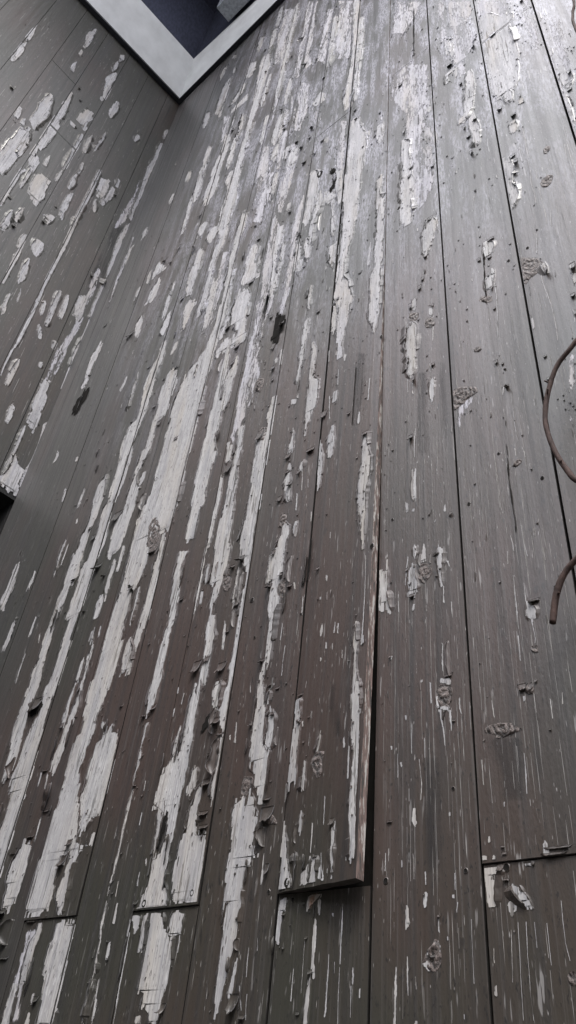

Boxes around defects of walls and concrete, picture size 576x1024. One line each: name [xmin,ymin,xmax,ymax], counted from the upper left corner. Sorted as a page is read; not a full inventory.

peeling [406,0,554,173]
peeling [0,0,459,1024]
peeling [482,836,535,932]